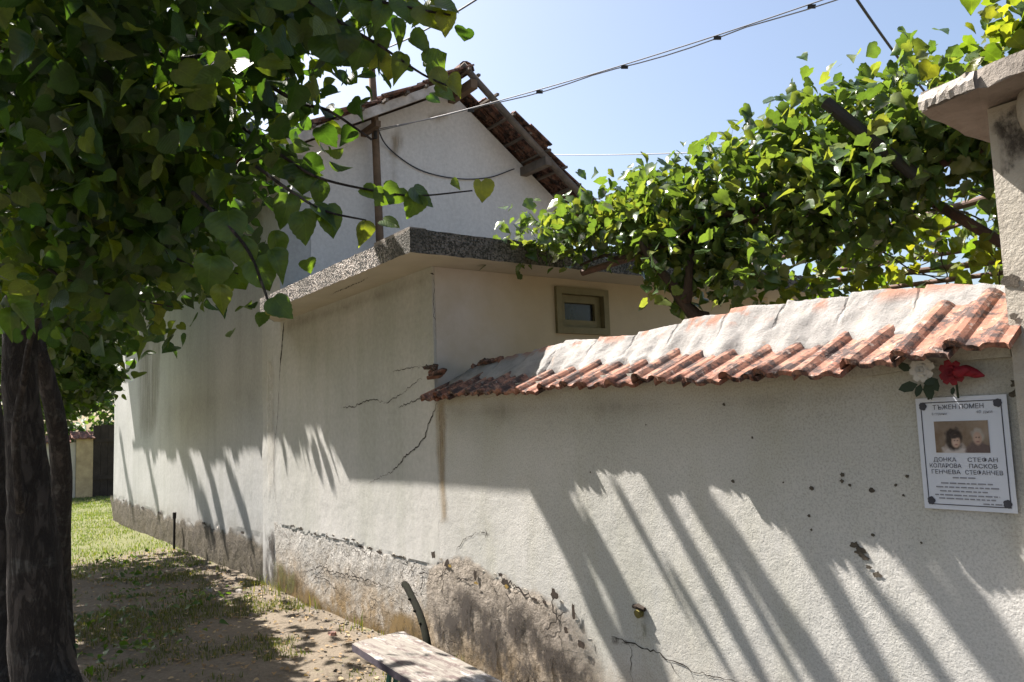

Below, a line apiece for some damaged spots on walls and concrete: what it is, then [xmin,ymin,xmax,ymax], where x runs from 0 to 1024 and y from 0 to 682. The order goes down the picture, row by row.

mould [994,111,1024,167]
crack [346,364,436,482]
spalling [110,496,592,682]
crack [612,636,747,682]